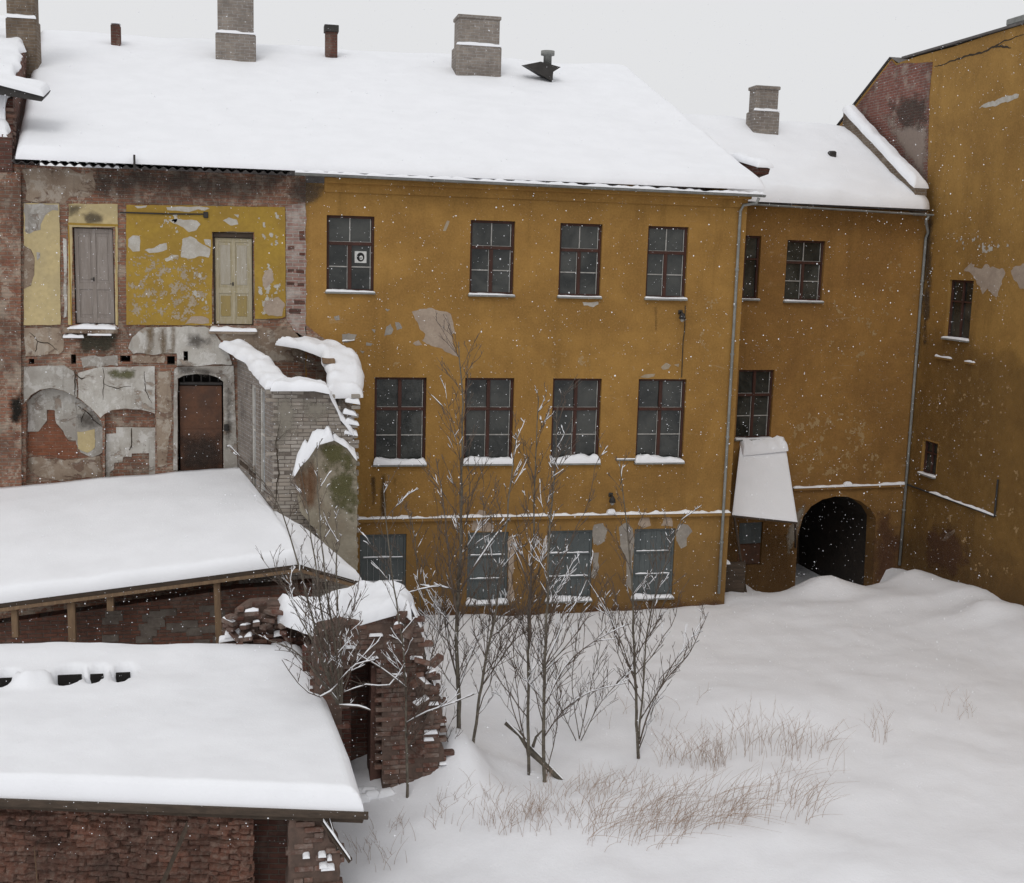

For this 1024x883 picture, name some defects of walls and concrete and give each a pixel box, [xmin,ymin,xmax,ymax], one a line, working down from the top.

crack [935,34,1024,67]
peeling [980,94,1019,108]
peeling [24,203,58,234]
spalling [258,212,305,256]
peeling [128,206,211,324]
peeling [956,236,1024,297]
peeling [412,308,458,357]
crack [74,370,152,427]
peeling [591,517,692,591]